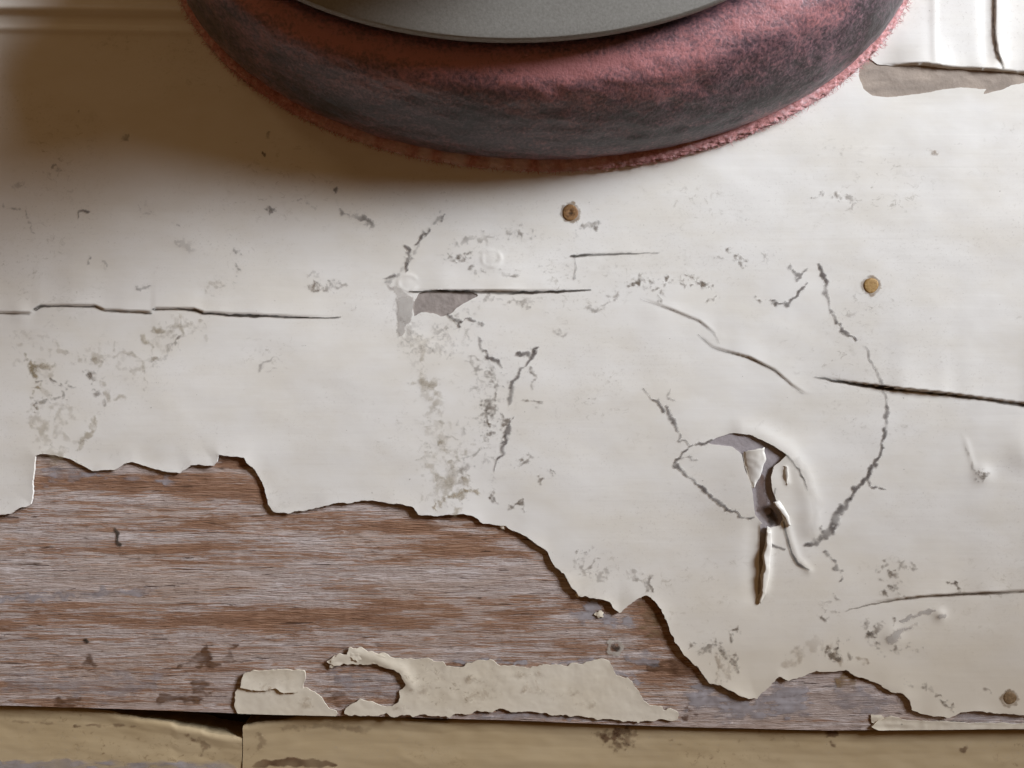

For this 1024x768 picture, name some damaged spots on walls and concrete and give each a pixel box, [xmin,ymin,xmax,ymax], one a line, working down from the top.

peeling [859,58,1024,97]
crack [571,251,637,259]
crack [153,308,338,318]
crack [389,232,483,328]
peeling [397,292,478,336]
crack [510,288,586,296]
crack [772,264,857,341]
crack [485,347,538,391]
crack [652,399,754,519]
crack [772,377,1024,581]
peeling [0,454,1024,731]
crack [942,589,1022,597]